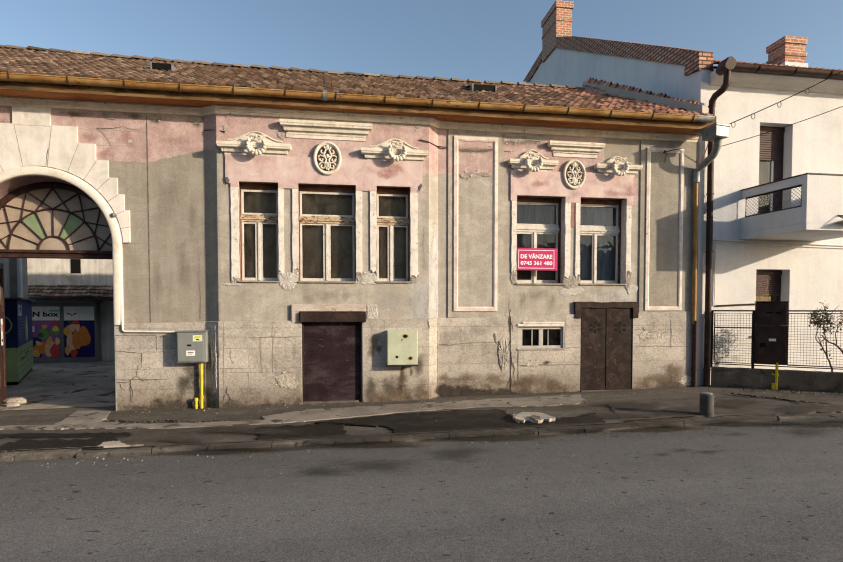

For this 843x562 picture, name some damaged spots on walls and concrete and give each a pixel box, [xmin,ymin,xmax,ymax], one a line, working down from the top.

spalling [278,272,299,291]
crack [428,292,564,389]
crack [118,365,149,397]
spalling [274,372,300,389]
water stain [368,375,405,399]
water stain [436,376,516,397]
crack [107,389,258,423]